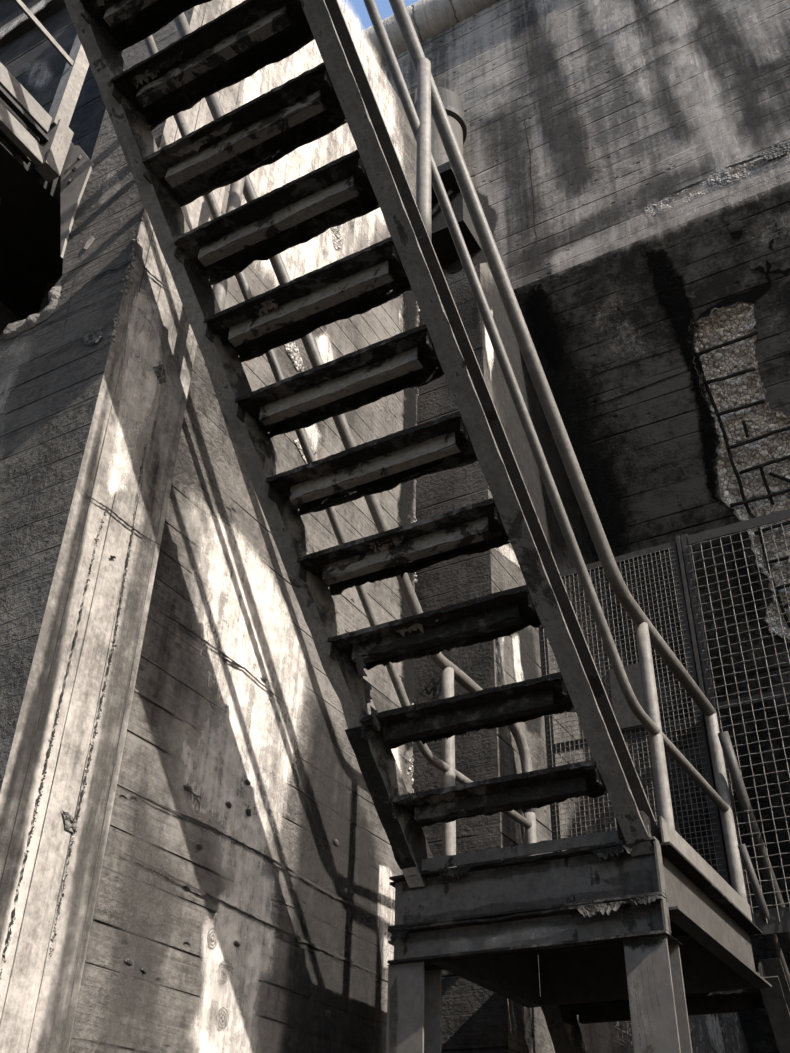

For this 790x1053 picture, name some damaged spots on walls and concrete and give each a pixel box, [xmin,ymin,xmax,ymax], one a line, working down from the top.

water stain [515,0,598,196]
water stain [589,0,790,166]
spalling [0,281,61,340]
water stain [645,249,722,505]
spalling [688,302,790,641]